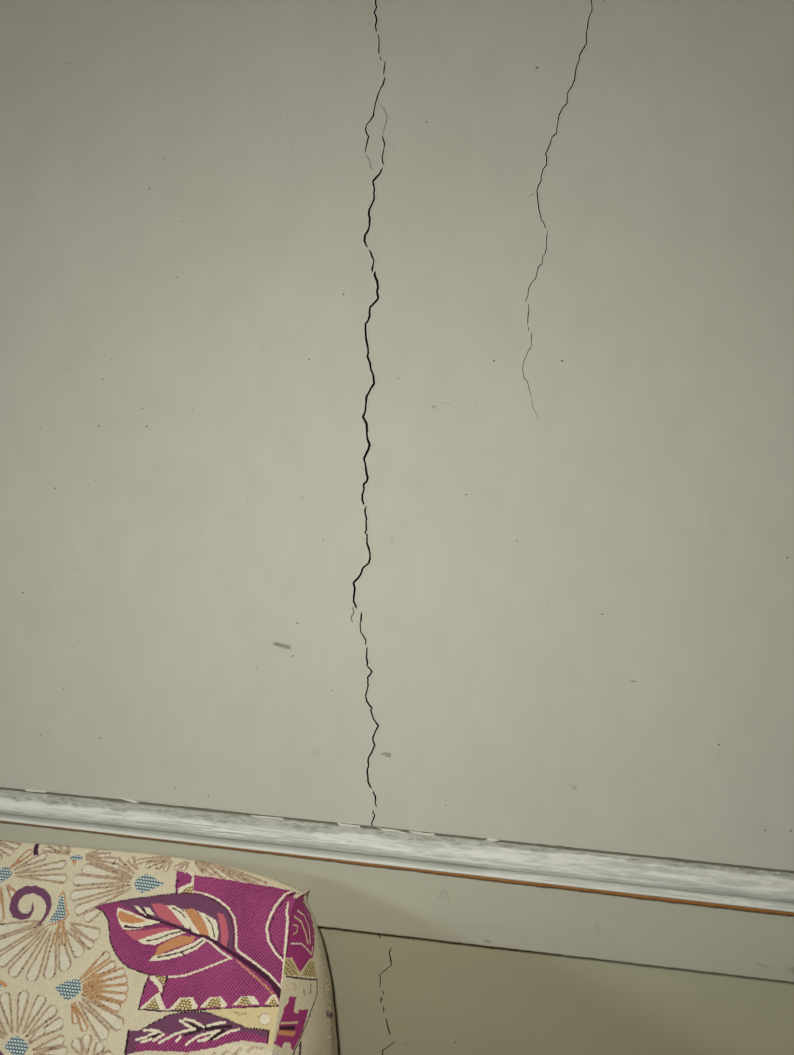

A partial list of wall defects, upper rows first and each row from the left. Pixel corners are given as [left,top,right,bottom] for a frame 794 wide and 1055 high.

crack [351,0,388,826]
crack [522,0,604,415]